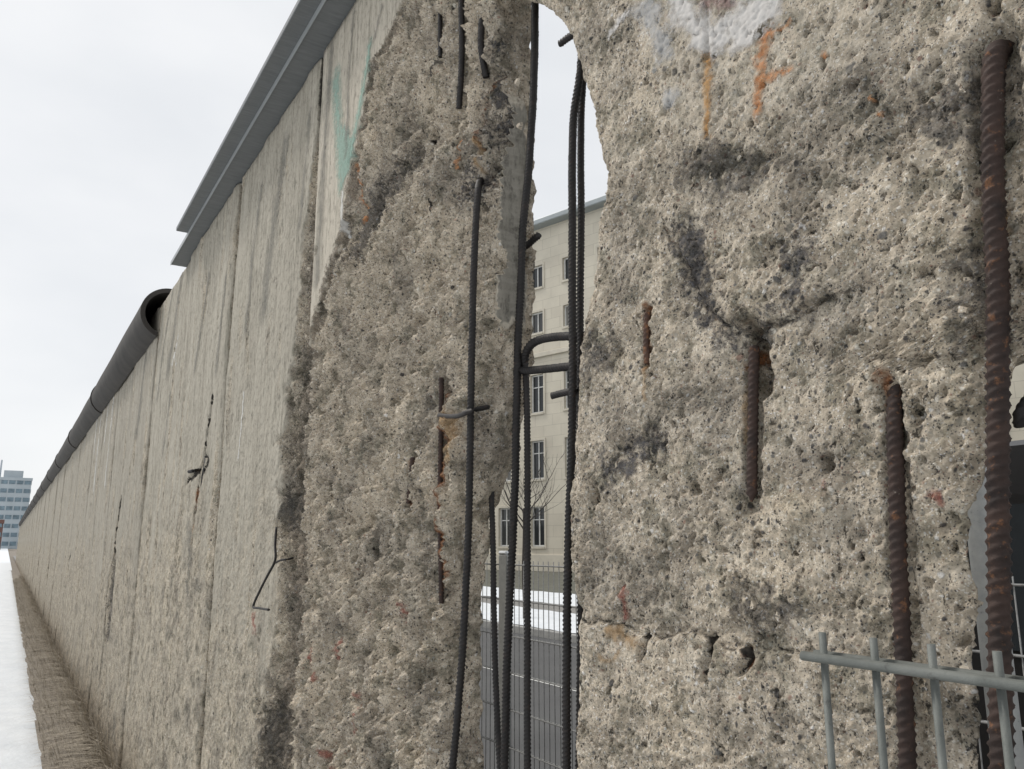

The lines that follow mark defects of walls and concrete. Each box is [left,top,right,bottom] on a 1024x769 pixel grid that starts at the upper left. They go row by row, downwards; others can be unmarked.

peeling [608,0,790,204]
spalling [253,19,442,769]
spalling [437,0,623,769]
spalling [594,417,676,495]
spalling [643,312,651,364]
spalling [659,211,816,502]
rust [747,333,772,368]
spalling [728,578,806,637]
spalling [885,380,913,662]
spalling [901,39,1024,675]
spalling [894,674,918,769]
spalling [986,688,1016,769]